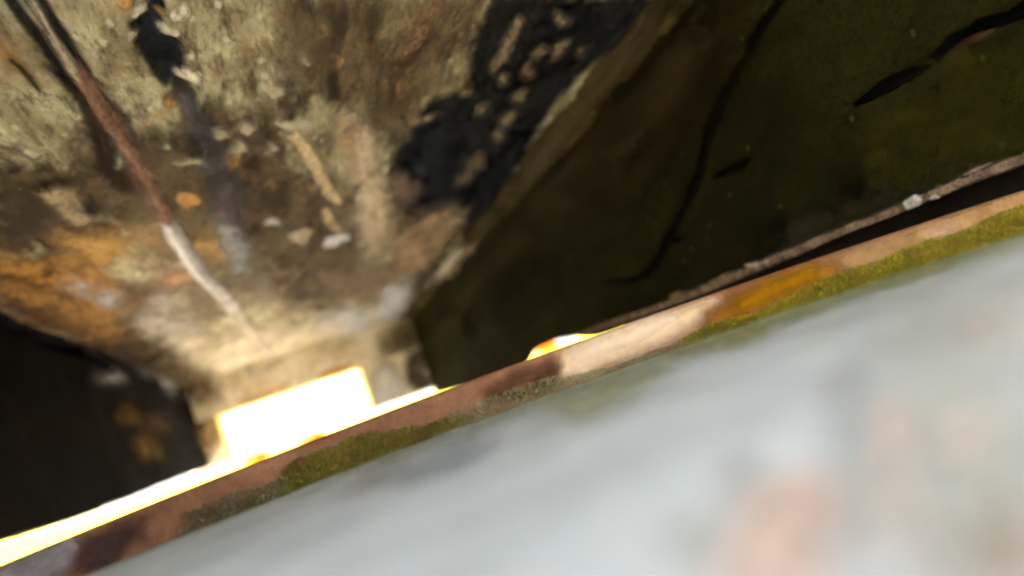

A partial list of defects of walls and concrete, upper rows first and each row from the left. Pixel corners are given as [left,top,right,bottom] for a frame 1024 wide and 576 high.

corrosion [0,66,201,341]
corrosion [321,365,350,378]
damp [0,0,719,407]
crack [604,0,785,283]
corrosion [705,261,843,327]
crack [854,1,1024,106]